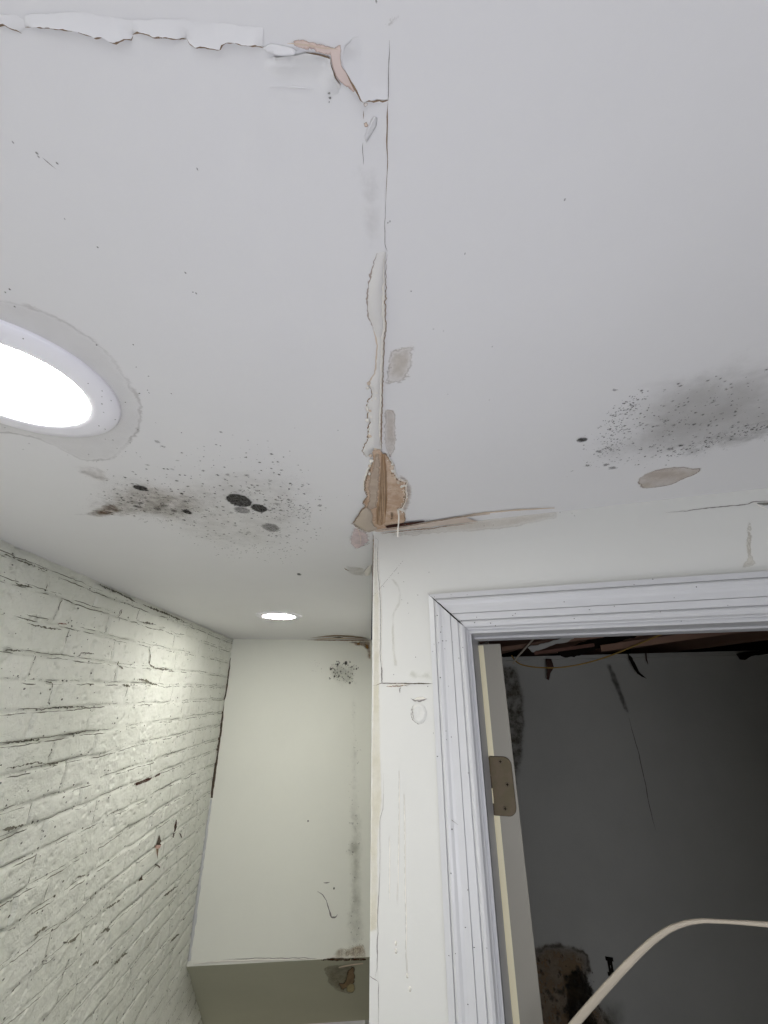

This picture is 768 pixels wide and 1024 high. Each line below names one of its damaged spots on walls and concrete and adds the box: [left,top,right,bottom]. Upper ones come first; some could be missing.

peeling [0,12,354,102]
crack [347,42,390,451]
damp [577,389,767,487]
damp [105,453,322,561]
spalling [352,448,408,548]